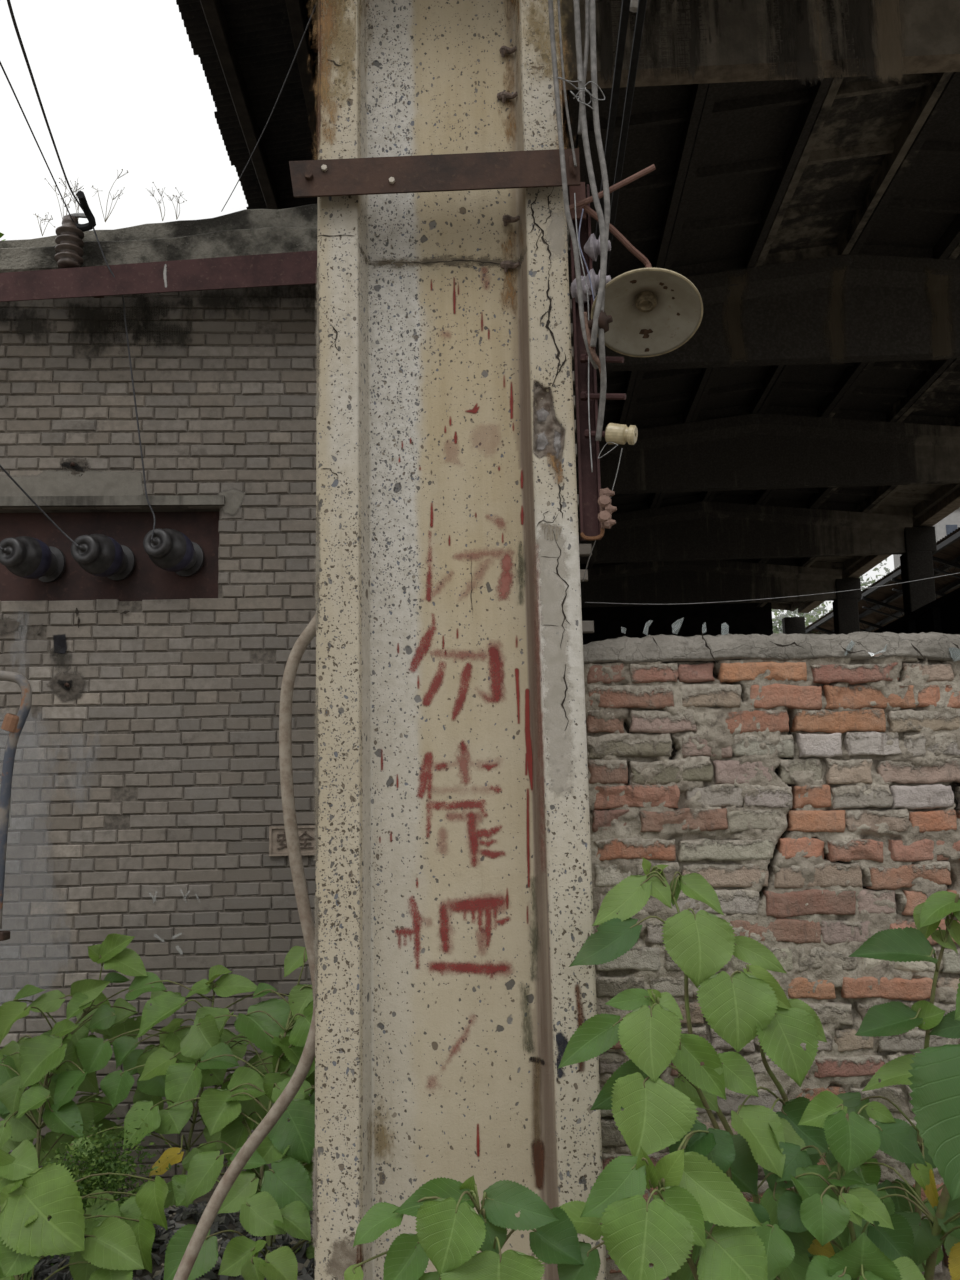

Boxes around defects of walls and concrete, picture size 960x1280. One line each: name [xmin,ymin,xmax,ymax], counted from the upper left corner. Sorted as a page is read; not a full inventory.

corrosion [313,0,337,148]
water stain [596,0,718,83]
water stain [766,0,904,85]
water stain [69,286,316,351]
crack [530,187,566,388]
spalling [533,380,565,484]
crack [537,484,570,730]
crack [701,630,733,685]